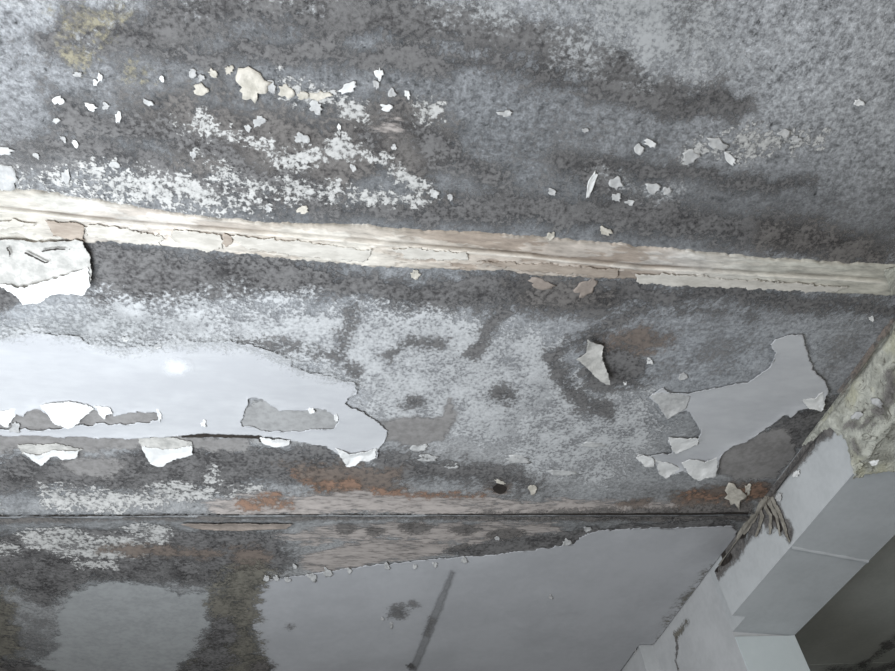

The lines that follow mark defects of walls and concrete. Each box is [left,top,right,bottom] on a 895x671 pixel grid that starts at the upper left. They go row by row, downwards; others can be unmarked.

peeling [85,102,122,123]
peeling [189,65,357,115]
peeling [373,68,410,112]
leakage [0,0,895,264]
peeling [635,273,848,294]
peeling [0,219,459,479]
leakage [0,241,895,502]
corrosion [282,461,407,495]
peeling [181,320,895,671]
leakage [443,517,737,557]
leakage [0,523,302,671]
mould [380,600,417,629]